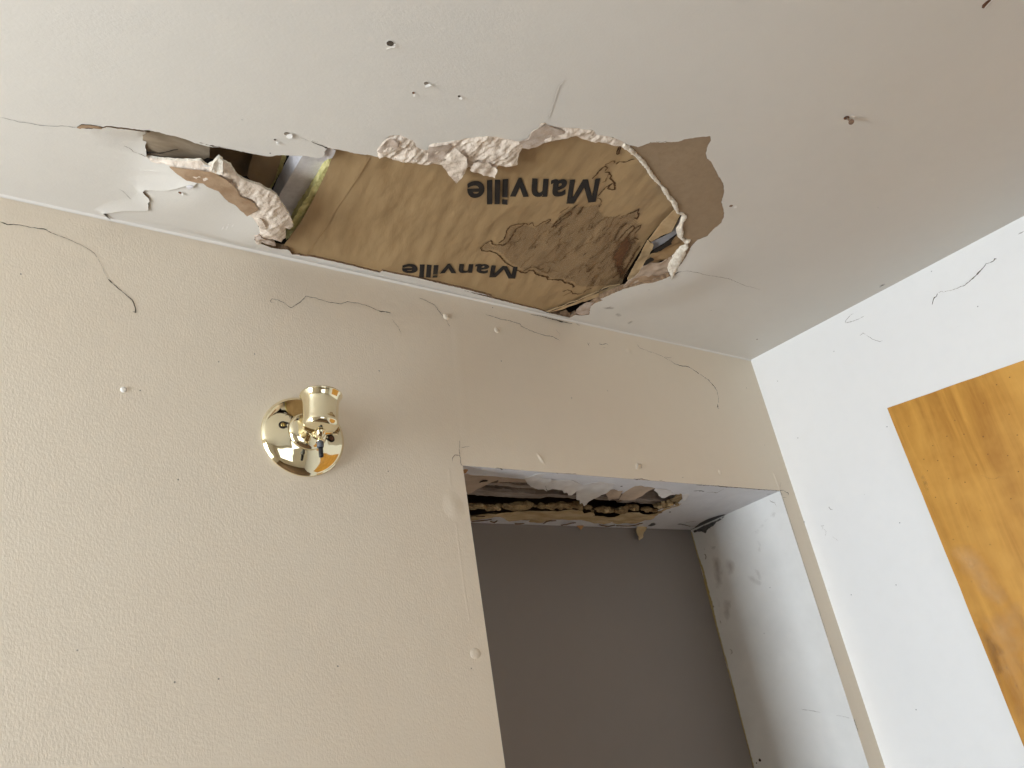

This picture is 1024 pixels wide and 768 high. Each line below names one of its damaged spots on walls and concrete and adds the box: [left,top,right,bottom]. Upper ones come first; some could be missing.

crack [1,222,136,313]
peeling [94,170,196,219]
water stain [480,146,641,296]
spalling [555,215,681,313]
peeling [467,473,689,540]